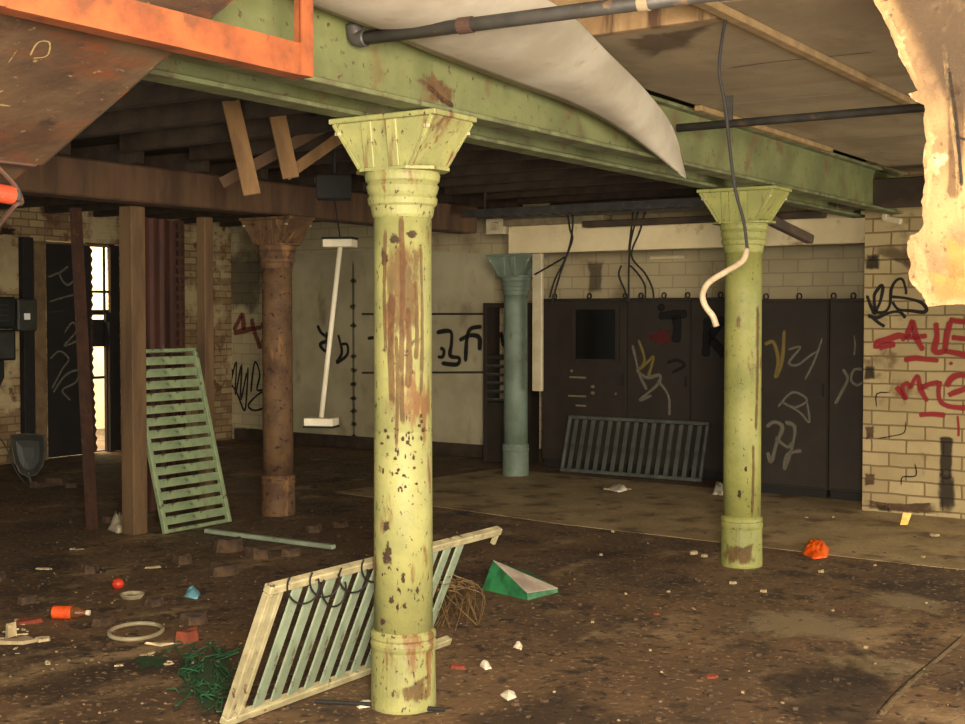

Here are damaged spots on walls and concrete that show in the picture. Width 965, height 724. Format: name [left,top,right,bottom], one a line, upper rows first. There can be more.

corrosion [421,76,454,108]
peeling [0,234,19,293]
spalling [866,255,879,269]
corrosion [381,218,424,444]
corrosion [403,678,426,701]